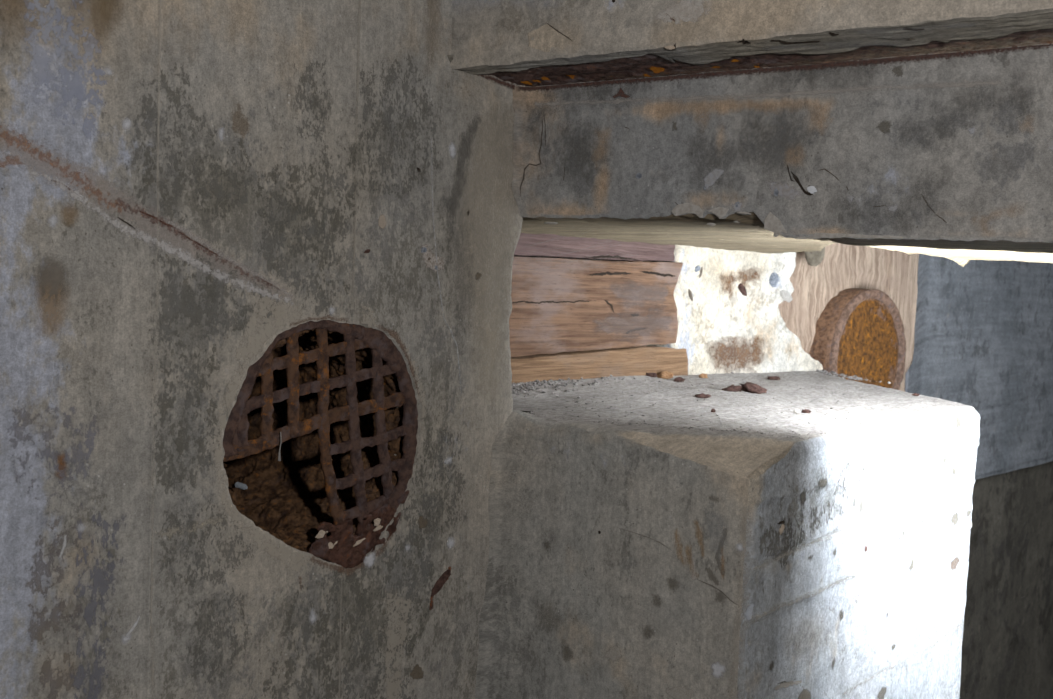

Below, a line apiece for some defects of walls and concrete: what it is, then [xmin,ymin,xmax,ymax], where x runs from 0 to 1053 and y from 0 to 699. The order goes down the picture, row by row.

corrosion [480,43,1053,98]
crack [520,112,565,196]
crack [0,126,292,302]
peeling [671,203,742,219]
peeling [764,212,903,239]
corrosion [308,490,409,574]
corrosion [429,566,451,610]